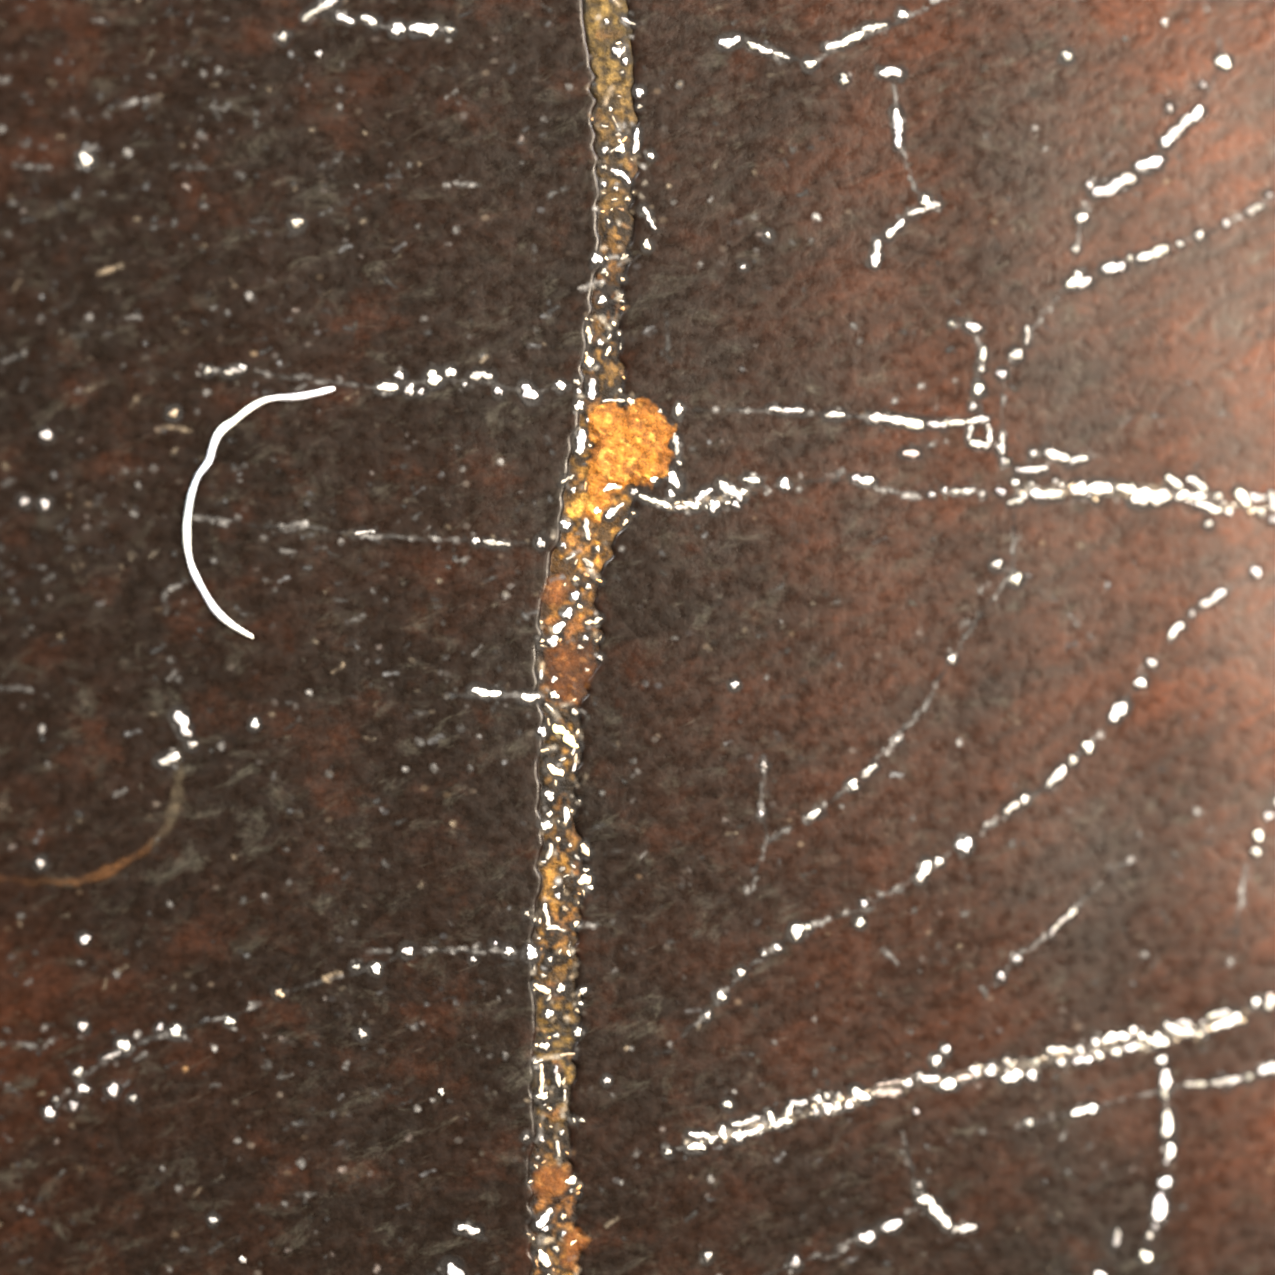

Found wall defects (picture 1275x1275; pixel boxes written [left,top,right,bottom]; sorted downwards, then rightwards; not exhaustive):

crack [203,364,268,378]
crack [195,516,231,525]
crack [277,0,1275,1275]
crack [213,978,327,1051]
crack [42,1022,186,1122]